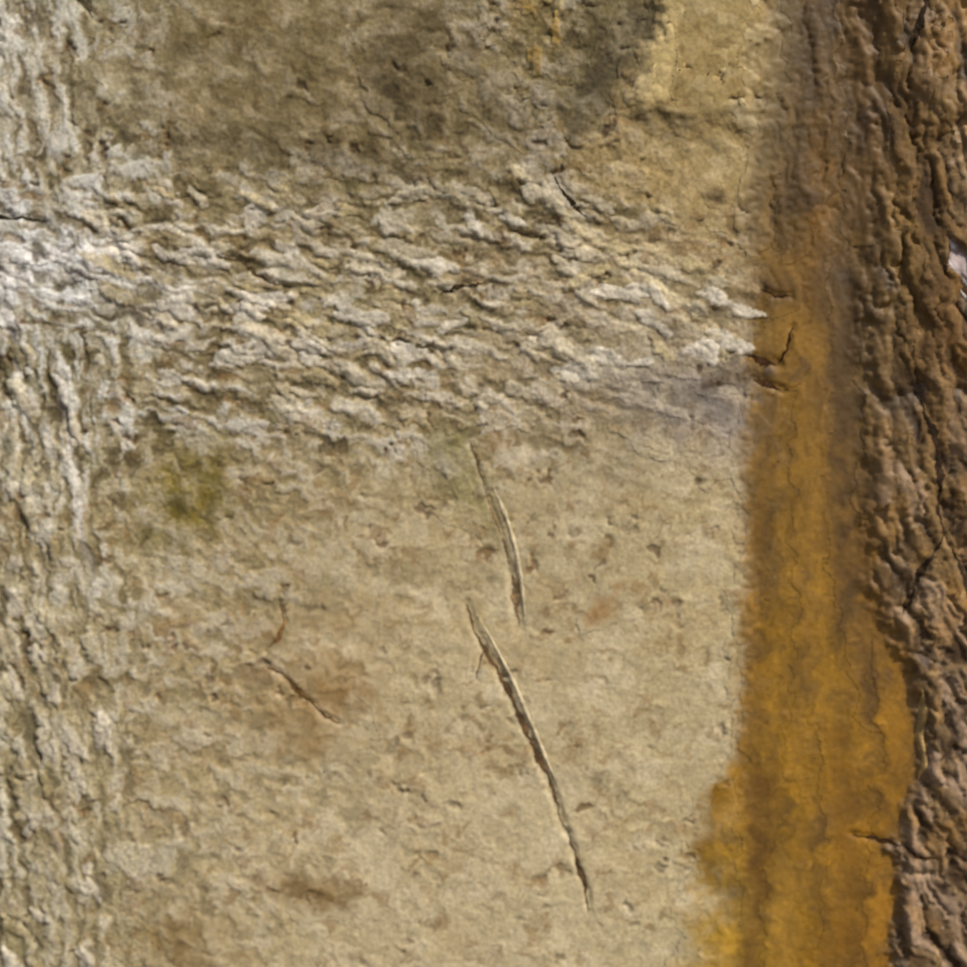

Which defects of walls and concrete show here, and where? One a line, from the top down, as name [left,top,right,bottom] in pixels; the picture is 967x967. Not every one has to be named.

spalling [945,231,967,316]
crack [469,439,525,626]
rust [575,580,629,635]
rust [656,0,967,967]
crack [903,388,967,615]
crack [467,604,590,911]
crack [854,834,938,861]